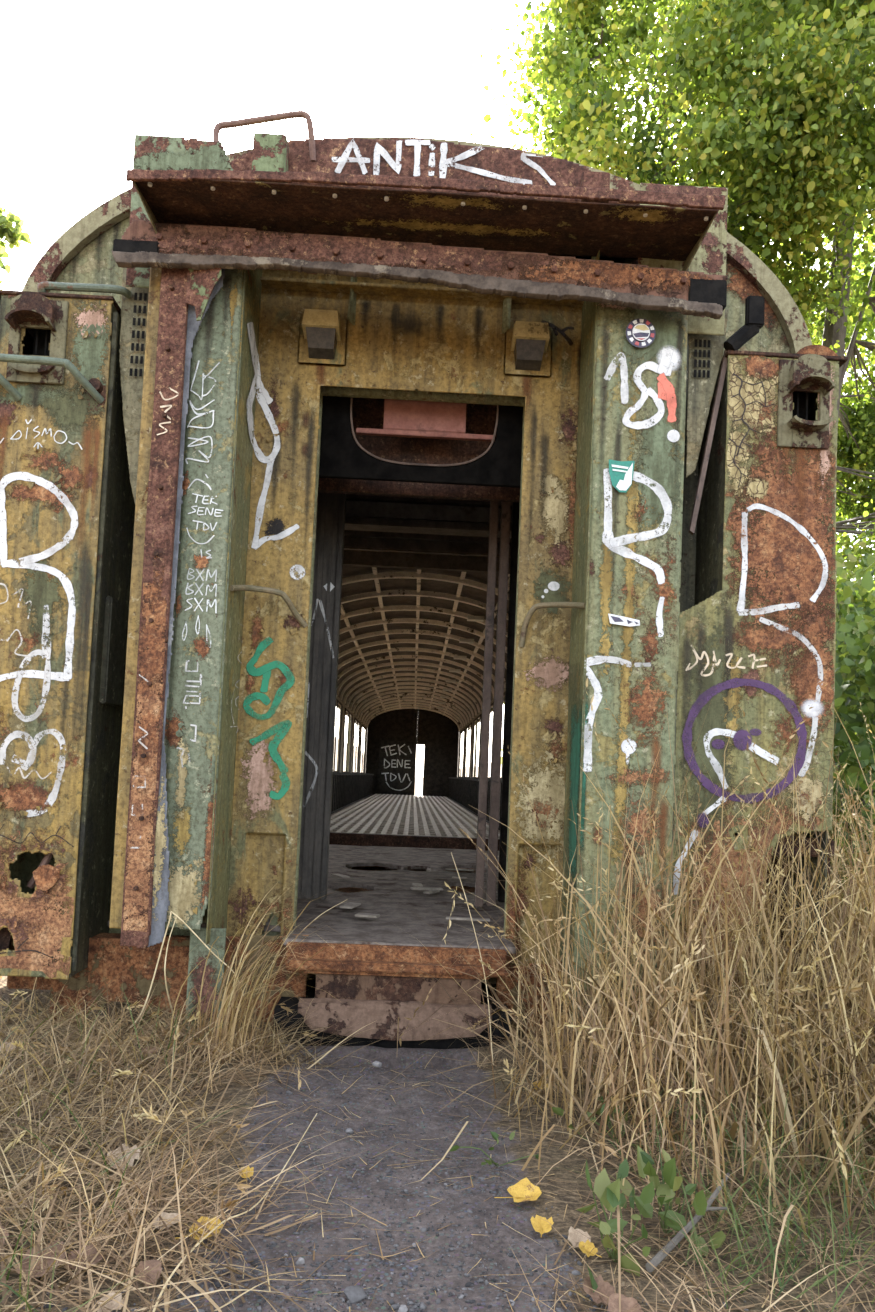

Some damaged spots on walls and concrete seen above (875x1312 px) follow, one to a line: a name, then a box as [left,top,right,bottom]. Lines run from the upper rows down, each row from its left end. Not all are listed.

peeling [134,145,231,170]
rust [646,183,727,206]
rust [0,381,106,511]
peeling [539,474,570,548]
crack [728,373,774,488]
peeling [532,563,572,619]
peeling [598,308,686,946]
rust [720,400,836,763]
rust [123,556,184,932]
peeling [513,690,589,905]
rust [593,538,823,991]